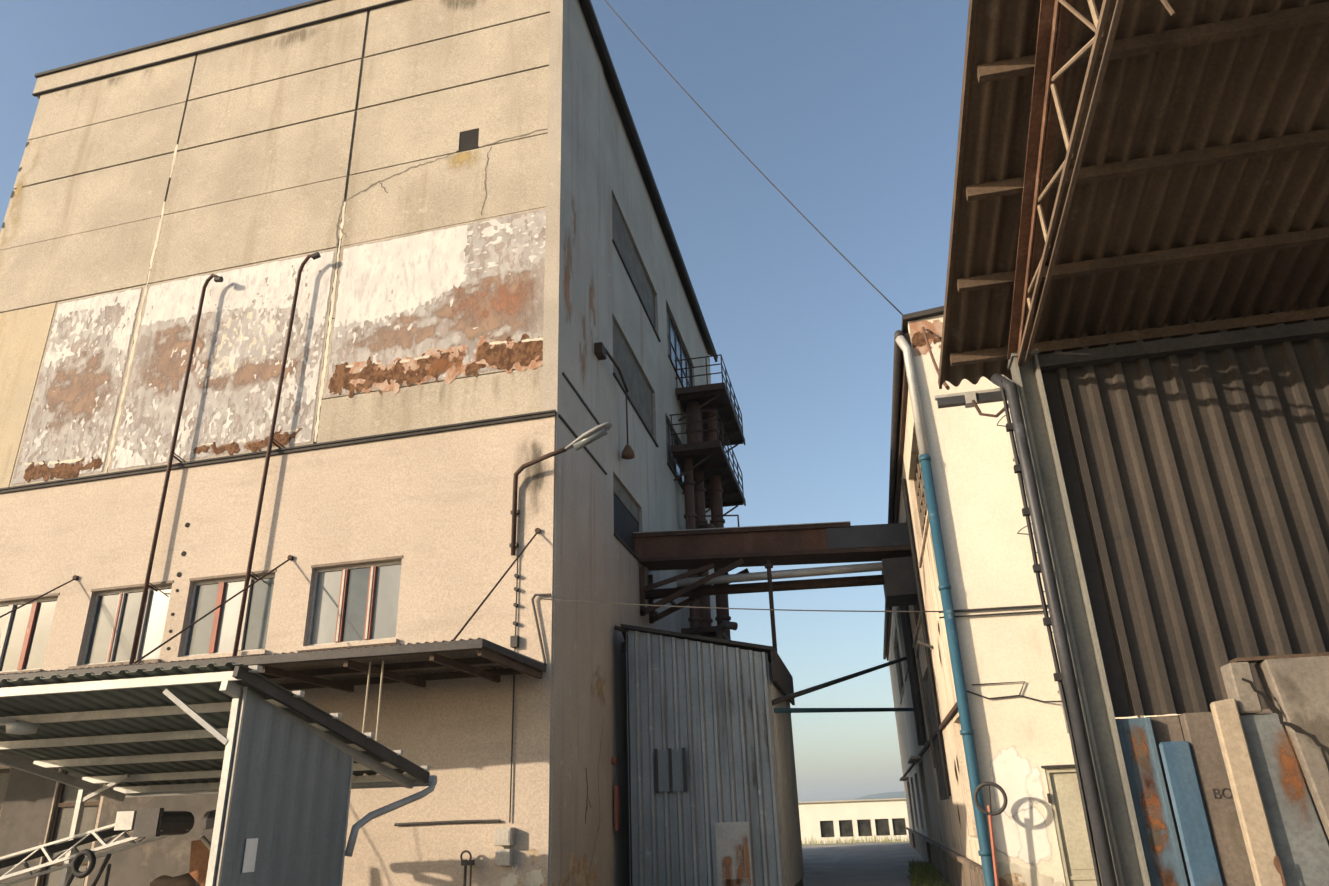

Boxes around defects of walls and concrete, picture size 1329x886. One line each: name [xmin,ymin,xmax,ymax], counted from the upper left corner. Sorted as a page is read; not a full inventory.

crack [336,129,548,248]
peeling [11,209,546,485]
flaking render [500,848,547,886]
flaking render [997,862,1063,886]